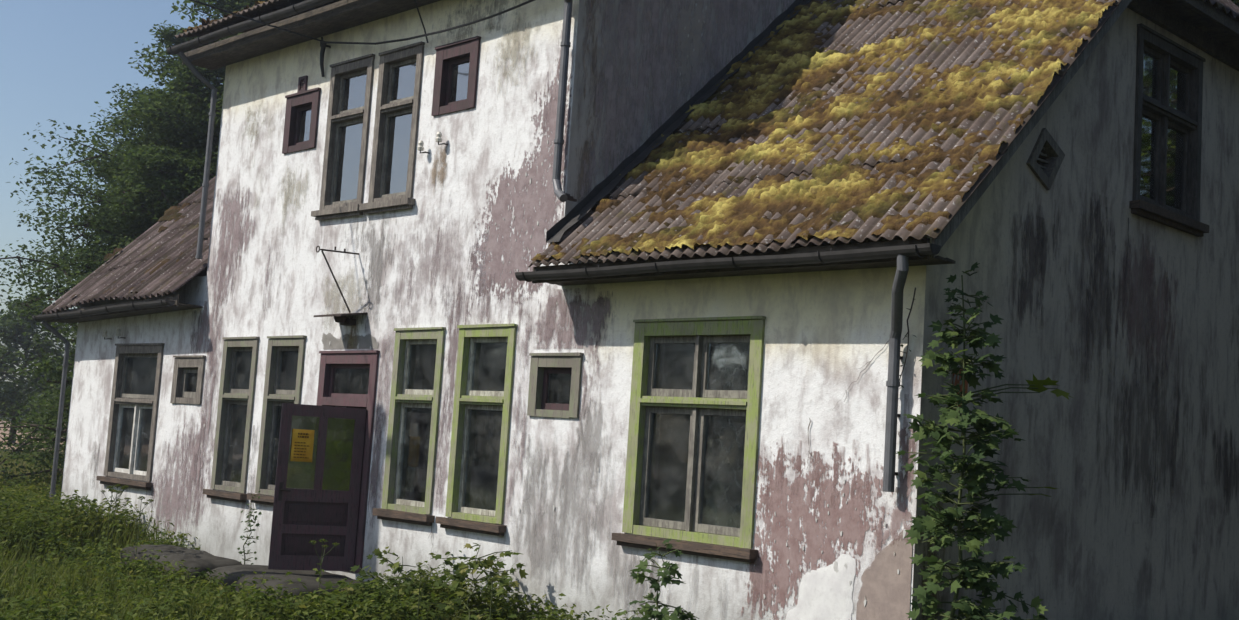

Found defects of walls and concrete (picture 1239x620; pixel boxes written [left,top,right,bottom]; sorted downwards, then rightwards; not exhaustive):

peeling [467,37,573,323]
leakage [578,0,794,201]
leakage [1013,214,1059,314]
leakage [1081,200,1179,486]
peeling [741,426,916,620]